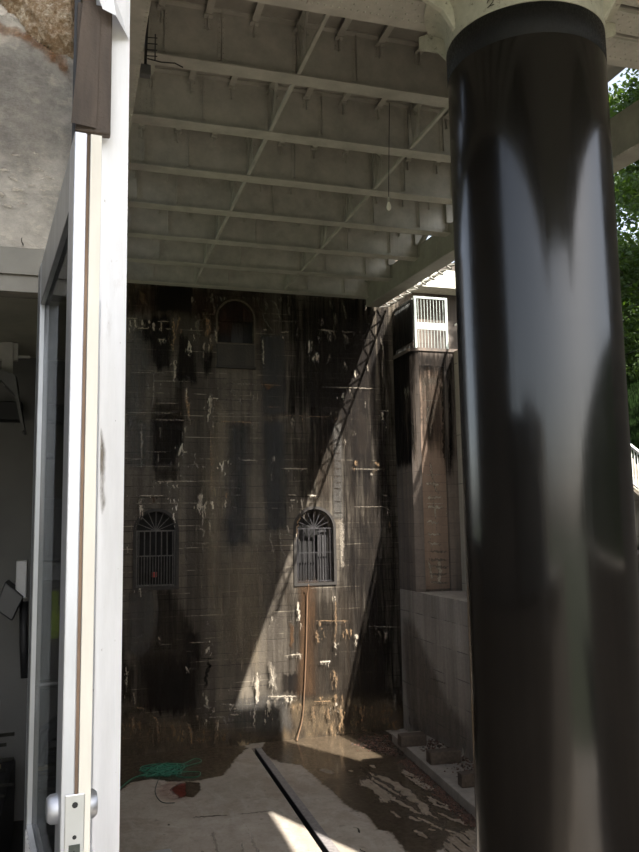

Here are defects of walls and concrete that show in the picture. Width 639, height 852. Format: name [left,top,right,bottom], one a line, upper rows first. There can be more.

spalling [0,0,83,59]
leakage [120,283,477,852]